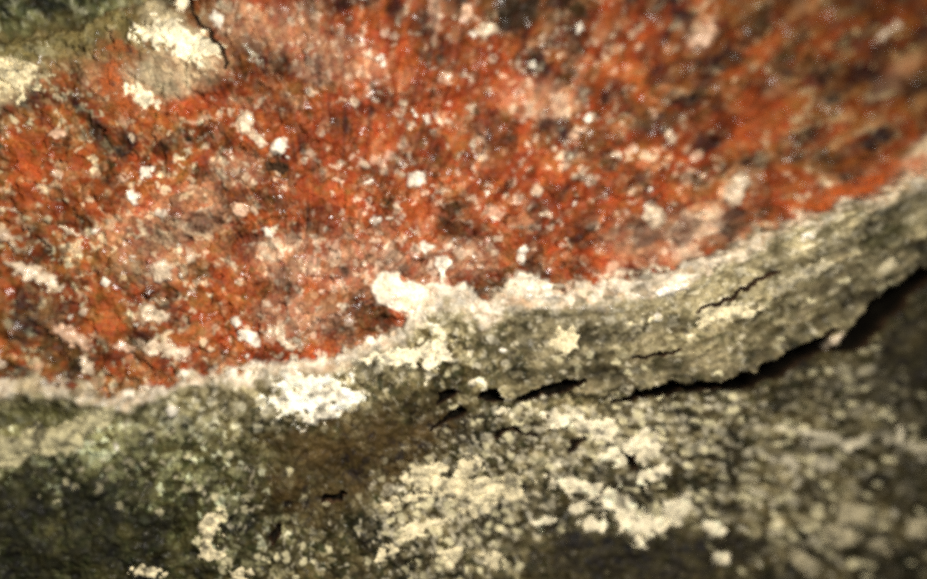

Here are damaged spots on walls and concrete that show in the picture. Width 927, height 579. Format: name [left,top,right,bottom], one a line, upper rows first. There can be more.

rust [99,61,135,115]
crack [610,265,927,404]